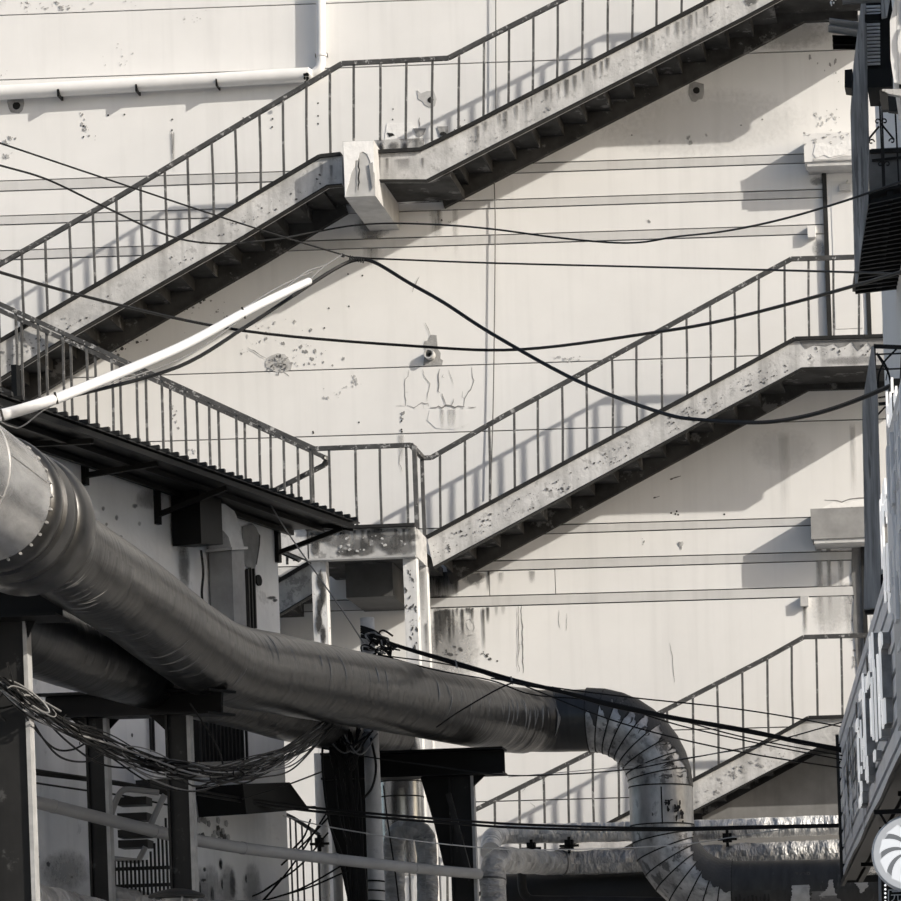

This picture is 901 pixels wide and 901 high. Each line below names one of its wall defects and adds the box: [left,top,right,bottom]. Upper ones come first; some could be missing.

corrosion [558,58,609,94]
crack [404,369,474,430]
corrosion [433,472,579,558]
damp [814,538,865,587]
damp [429,572,490,658]